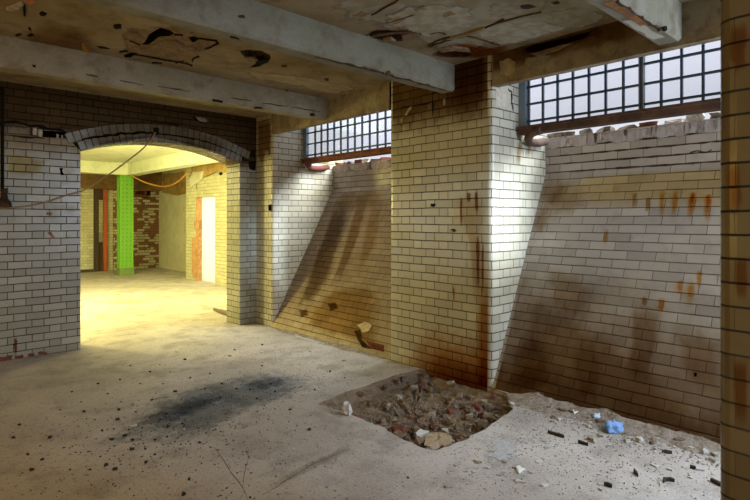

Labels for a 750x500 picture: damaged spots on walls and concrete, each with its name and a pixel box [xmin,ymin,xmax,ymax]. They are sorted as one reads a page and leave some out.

spalling [113,24,219,66]
peeling [340,0,629,77]
corrosion [603,0,667,40]
peeling [240,50,354,94]
spalling [547,112,721,138]
corrosion [460,193,478,222]
corrosion [476,238,484,283]
spalling [354,322,384,352]